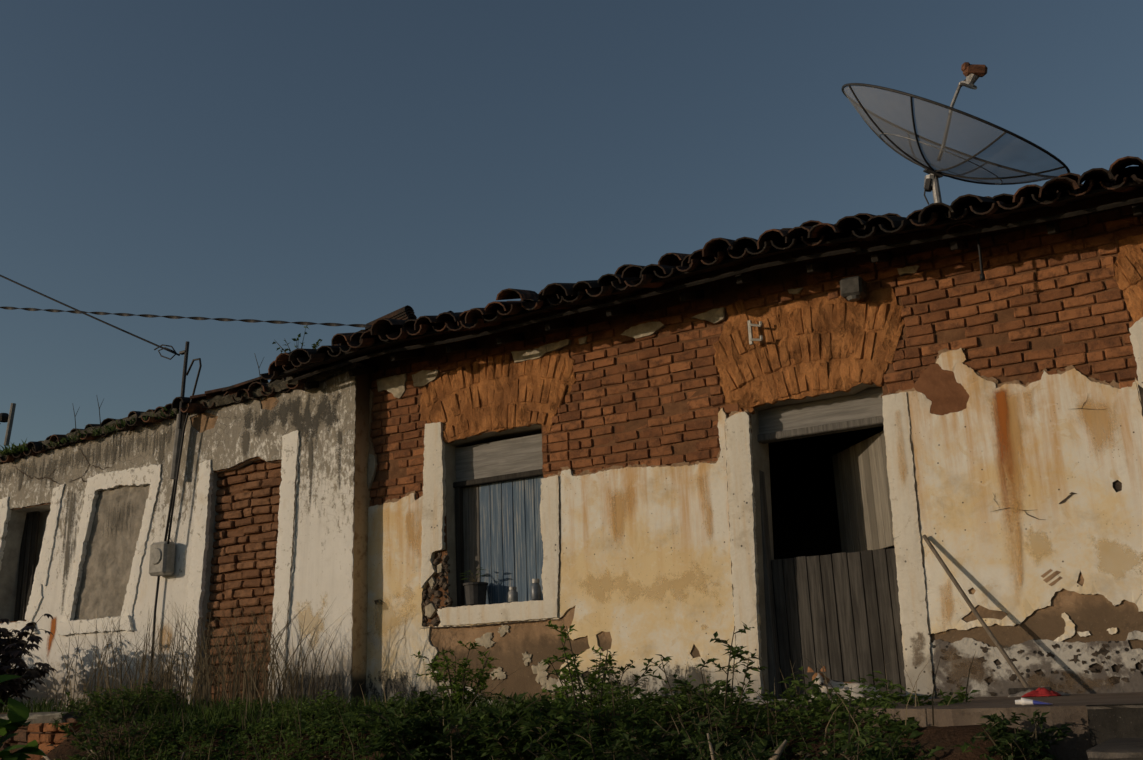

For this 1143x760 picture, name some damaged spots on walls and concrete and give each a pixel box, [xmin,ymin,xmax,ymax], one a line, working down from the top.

flaking render [367,202,1143,507]
water stain [0,424,175,491]
water stain [240,388,342,503]
corrosion [992,391,1031,517]
water stain [59,491,80,613]
flaking render [421,516,612,704]
flaking render [930,569,1143,696]